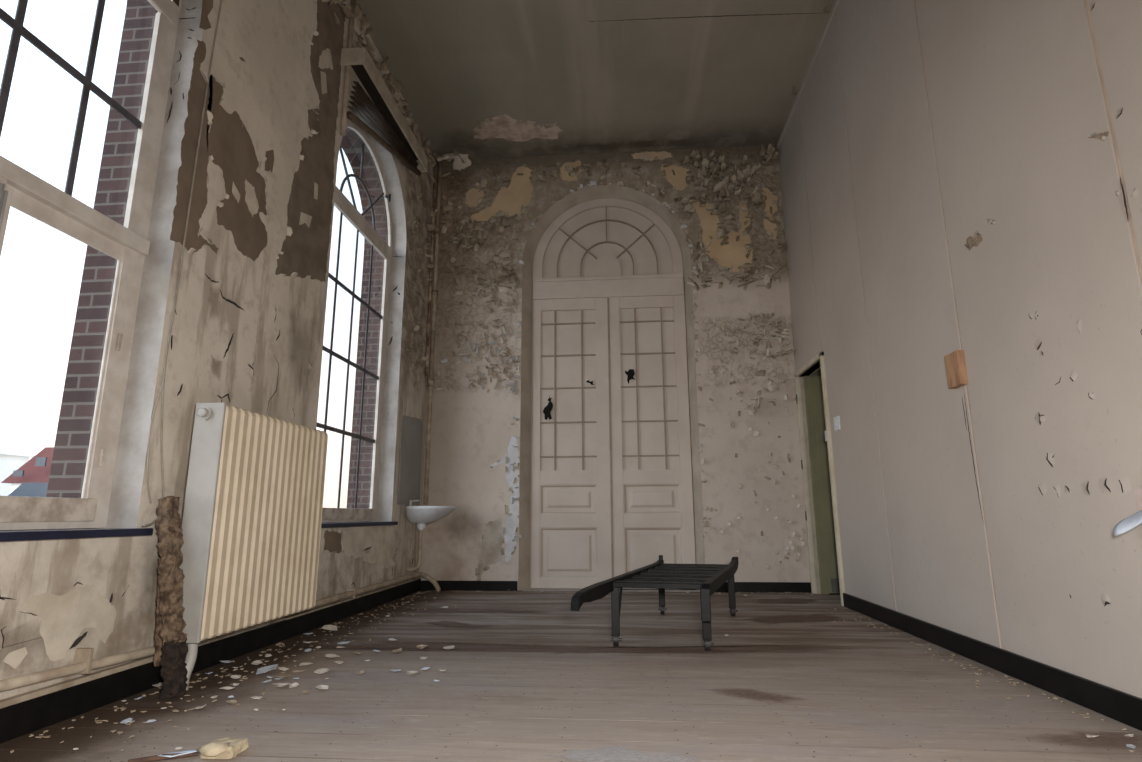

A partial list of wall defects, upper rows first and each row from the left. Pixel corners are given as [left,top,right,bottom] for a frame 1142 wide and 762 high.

peeling [170,0,471,283]
peeling [472,114,564,142]
peeling [463,144,786,401]
flaking render [964,219,997,251]
peeling [435,277,522,395]
peeling [722,312,800,437]
peeling [475,416,523,581]
peeling [3,647,28,669]
peeling [20,583,116,661]